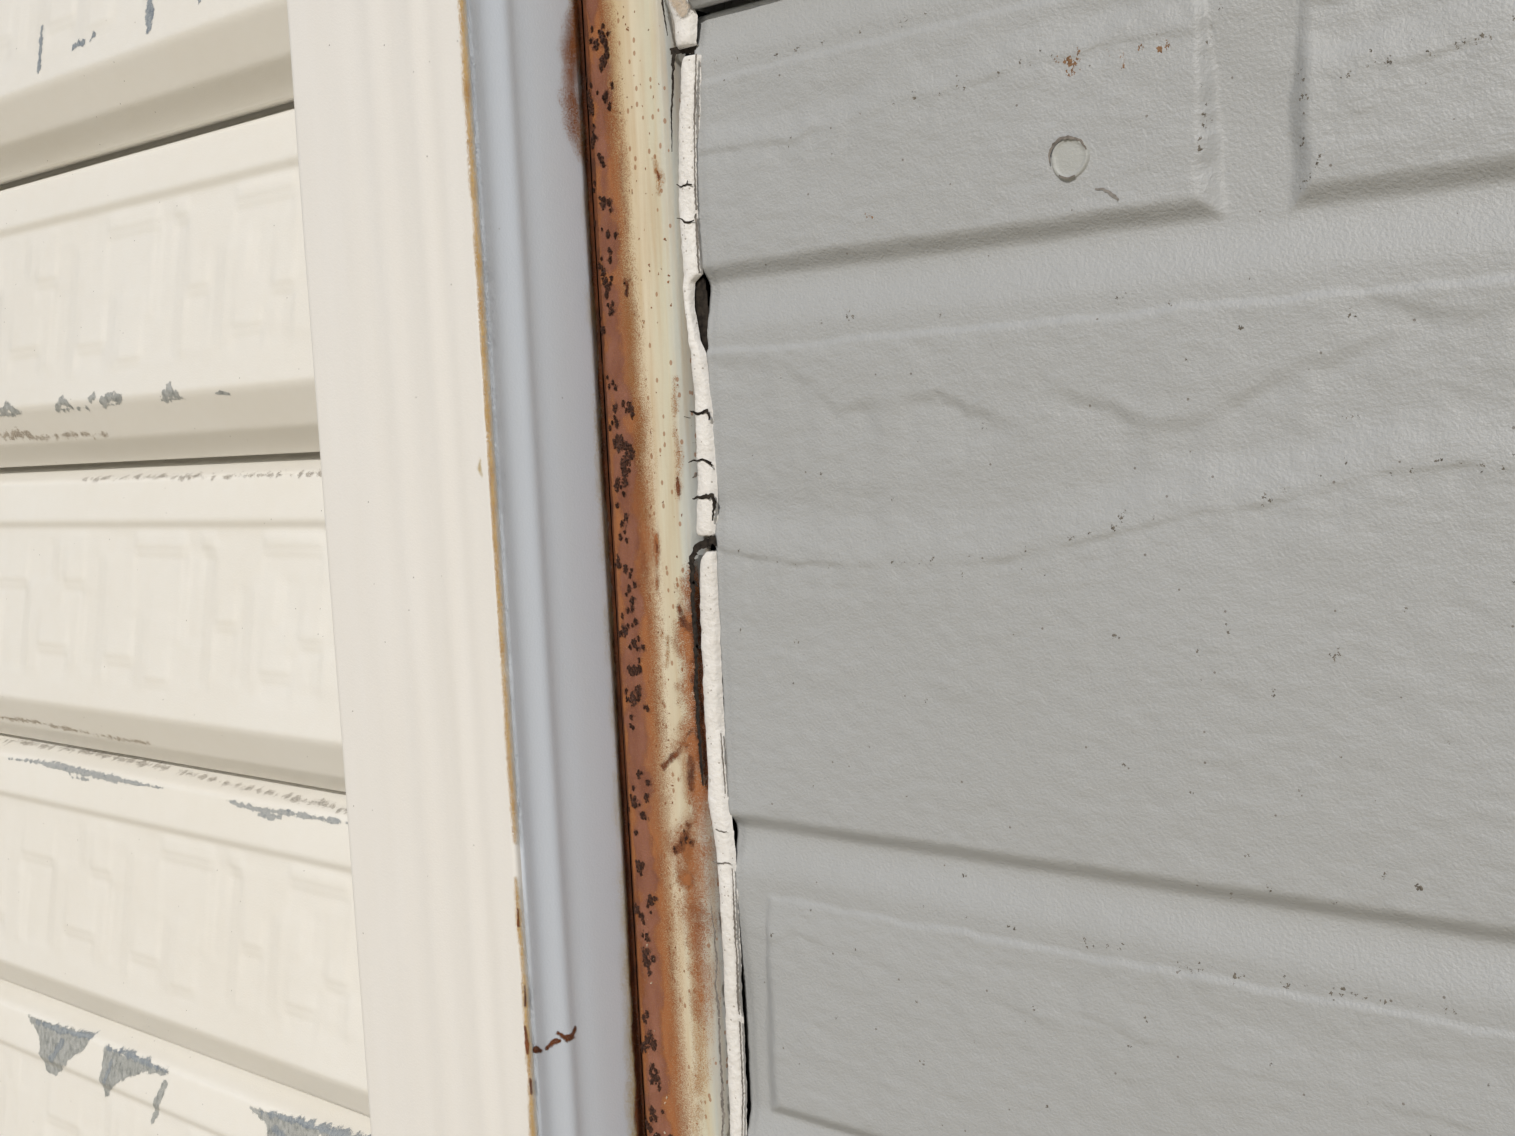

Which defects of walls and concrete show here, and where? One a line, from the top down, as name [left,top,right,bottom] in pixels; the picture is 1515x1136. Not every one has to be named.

peeling [145,0,154,34]
peeling [0,401,22,418]
peeling [55,391,123,413]
peeling [161,381,186,404]
corrosion [558,0,724,1136]
crack [684,409,726,794]
peeling [8,757,163,789]
peeling [230,800,348,825]
crack [711,829,744,1136]
peeling [28,1014,169,1124]
peeling [249,1107,371,1136]